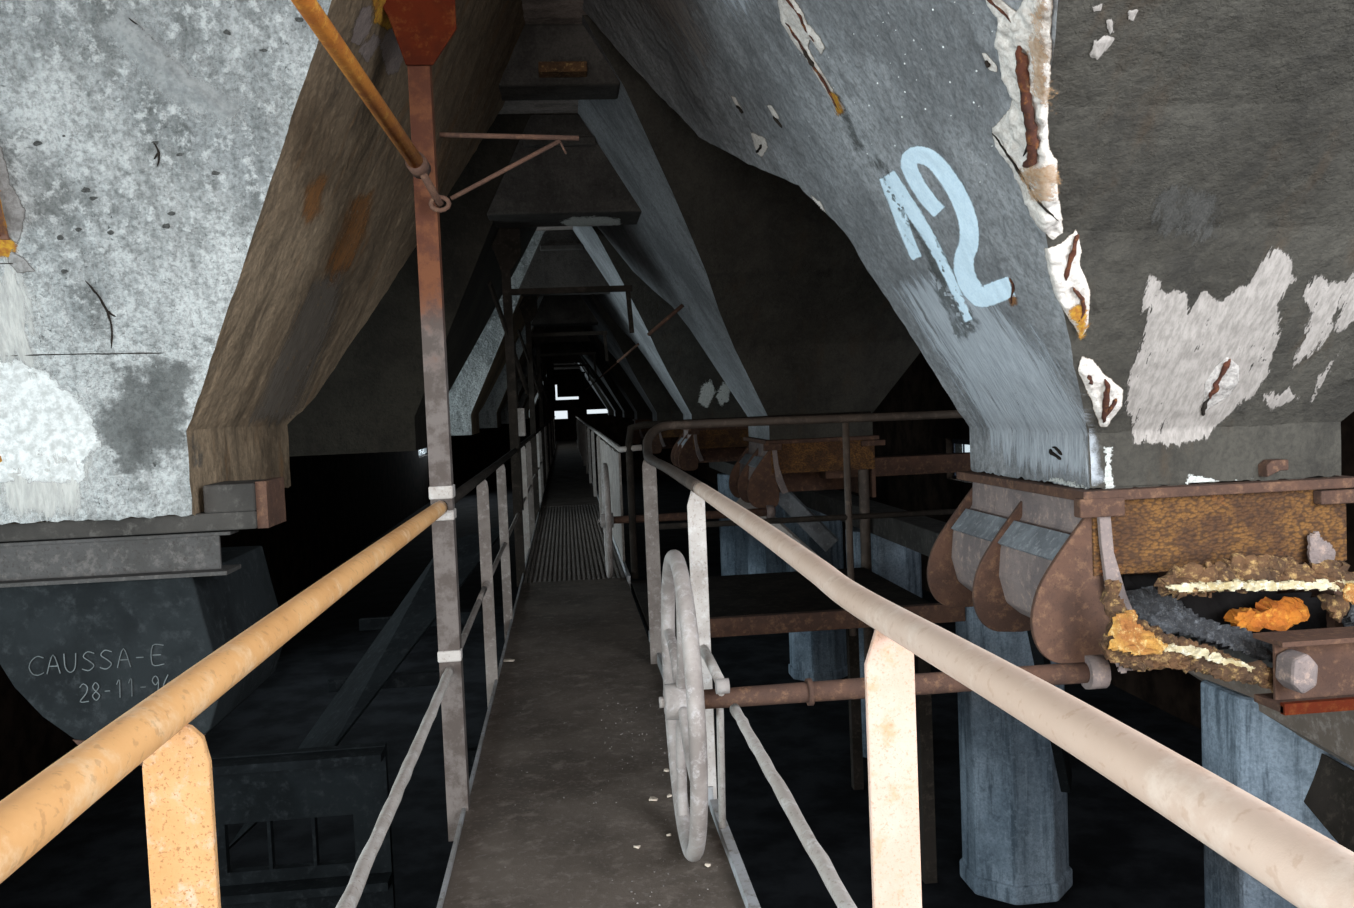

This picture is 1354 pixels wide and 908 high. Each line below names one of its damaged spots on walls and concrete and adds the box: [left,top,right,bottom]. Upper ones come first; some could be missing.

spalling [1089,4,1138,60]
corrosion [0,190,17,257]
crack [6,280,161,356]
leakage [0,257,191,520]
spalling [982,0,1090,340]
peeling [1078,247,1354,449]